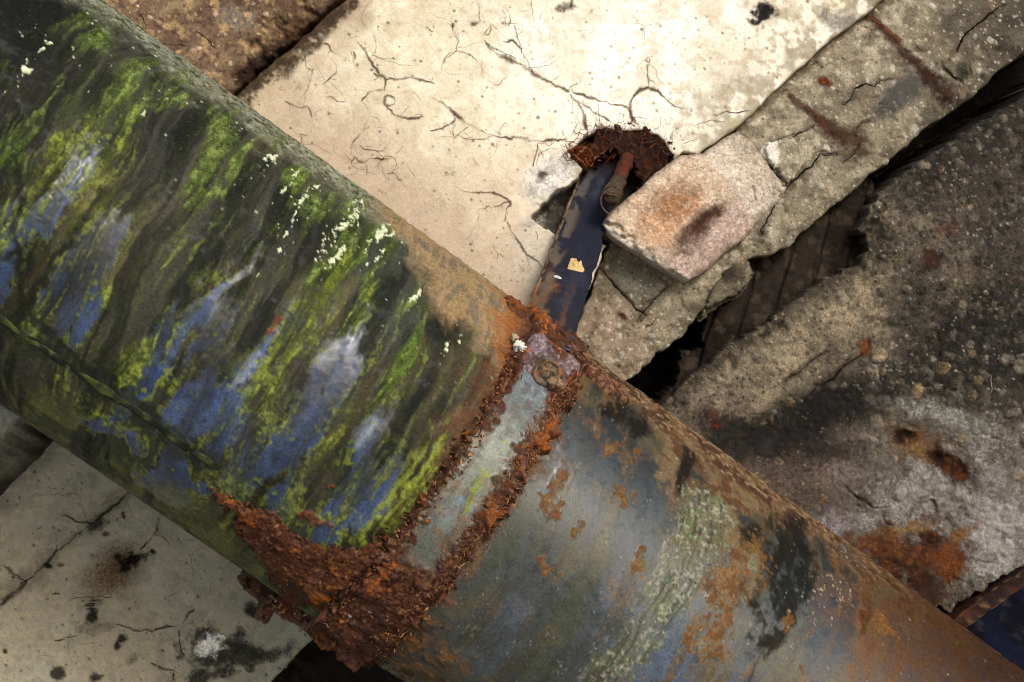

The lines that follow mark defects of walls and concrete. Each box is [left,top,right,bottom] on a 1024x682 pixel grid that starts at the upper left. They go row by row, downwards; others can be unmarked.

crack [284,1,750,180]
peeling [761,129,817,185]
corrosion [781,88,871,161]
corrosion [863,13,960,108]
crack [455,186,542,267]
crack [603,271,670,328]
peeling [696,260,755,321]
crack [0,492,128,606]
leakage [88,516,108,536]
corrosion [207,338,578,658]
corrosion [846,515,977,604]
corrosion [889,428,982,488]